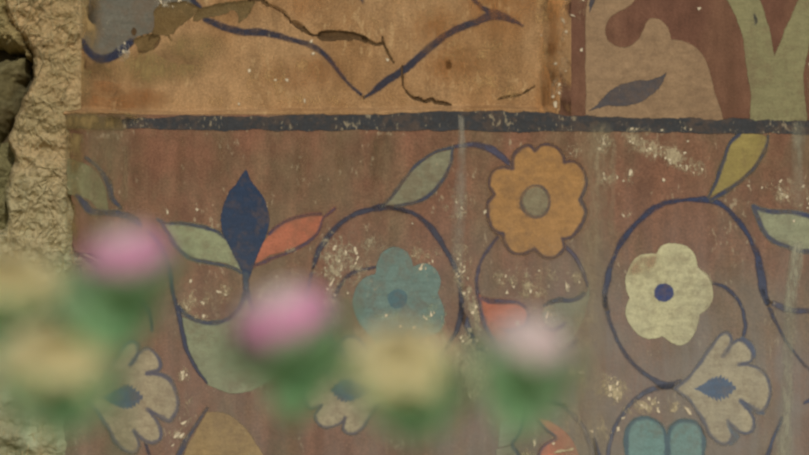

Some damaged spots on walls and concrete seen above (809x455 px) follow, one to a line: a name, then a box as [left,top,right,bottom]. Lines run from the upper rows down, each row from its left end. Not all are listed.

flaking render [122,0,255,54]
crack [248,0,317,36]
crack [364,36,452,106]
crack [498,86,535,100]